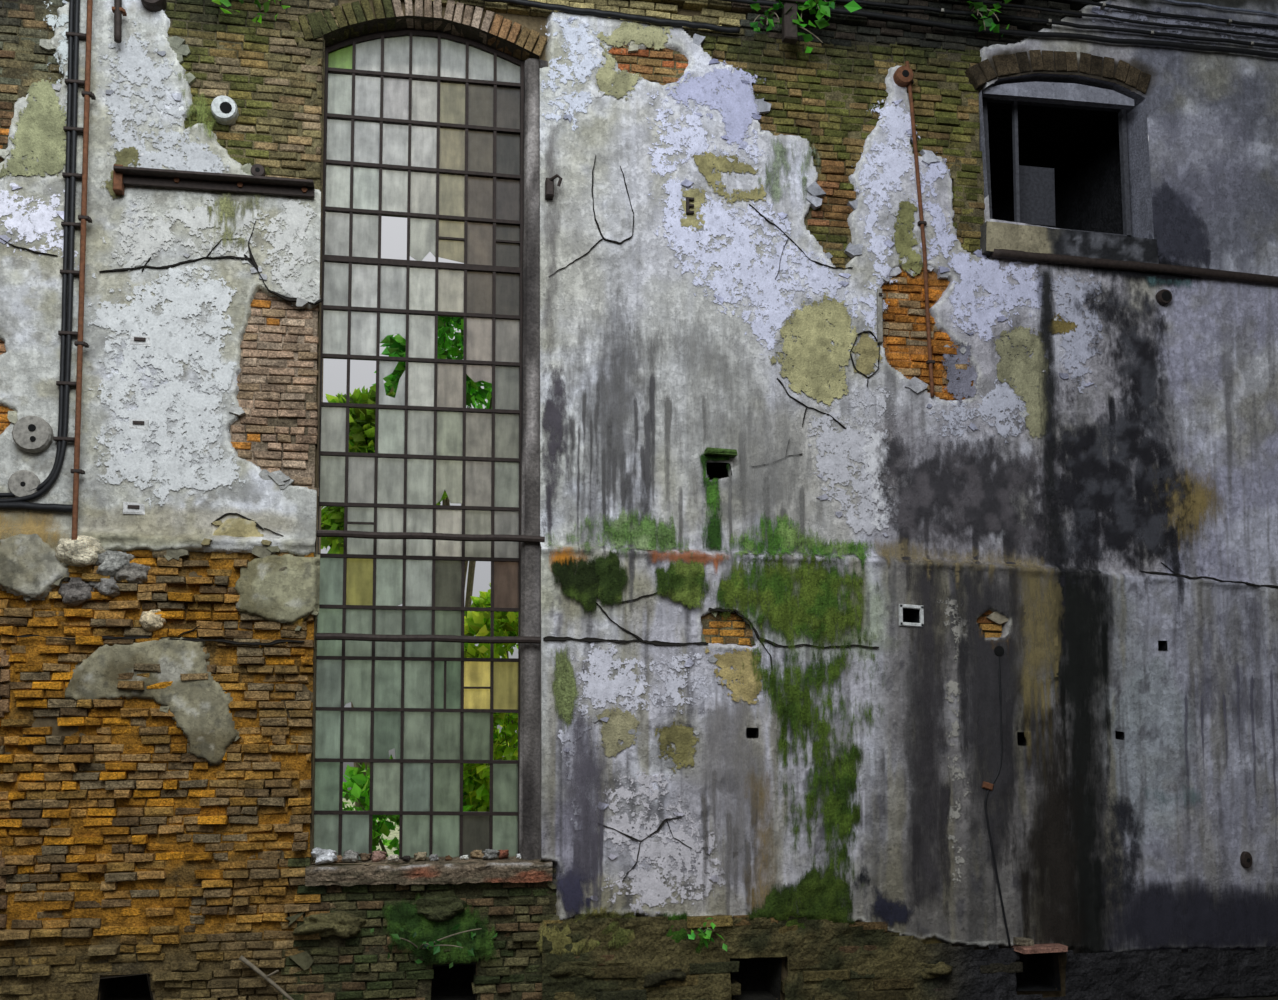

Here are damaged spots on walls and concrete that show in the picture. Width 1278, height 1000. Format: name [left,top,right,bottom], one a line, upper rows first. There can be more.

crack [1,238,57,256]
spalling [0,0,96,278]
crack [99,221,323,306]
spalling [84,0,348,508]
crack [549,155,634,277]
spalling [540,15,1103,538]
spalling [0,545,572,1000]
damp [552,710,605,917]
damp [542,328,683,596]
crack [598,817,691,881]
damp [759,621,834,771]
damp [783,182,1278,959]